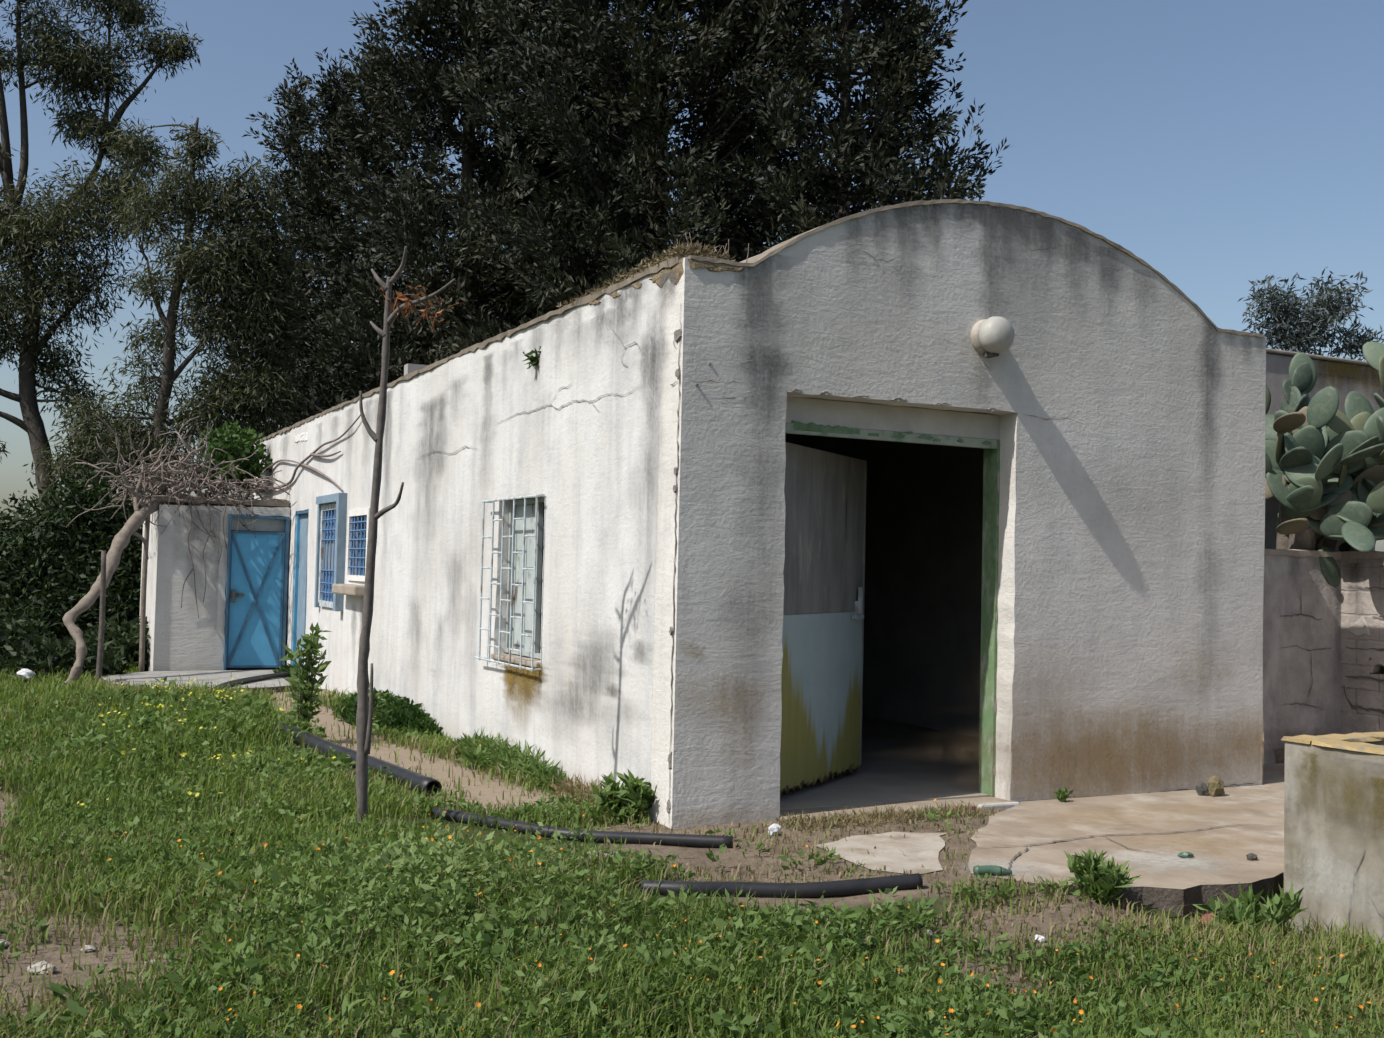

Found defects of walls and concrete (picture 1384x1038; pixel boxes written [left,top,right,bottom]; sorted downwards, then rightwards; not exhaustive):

spalling [589,258,745,305]
crack [501,305,745,813]
rust [504,664,541,703]
crack [978,824,1283,876]